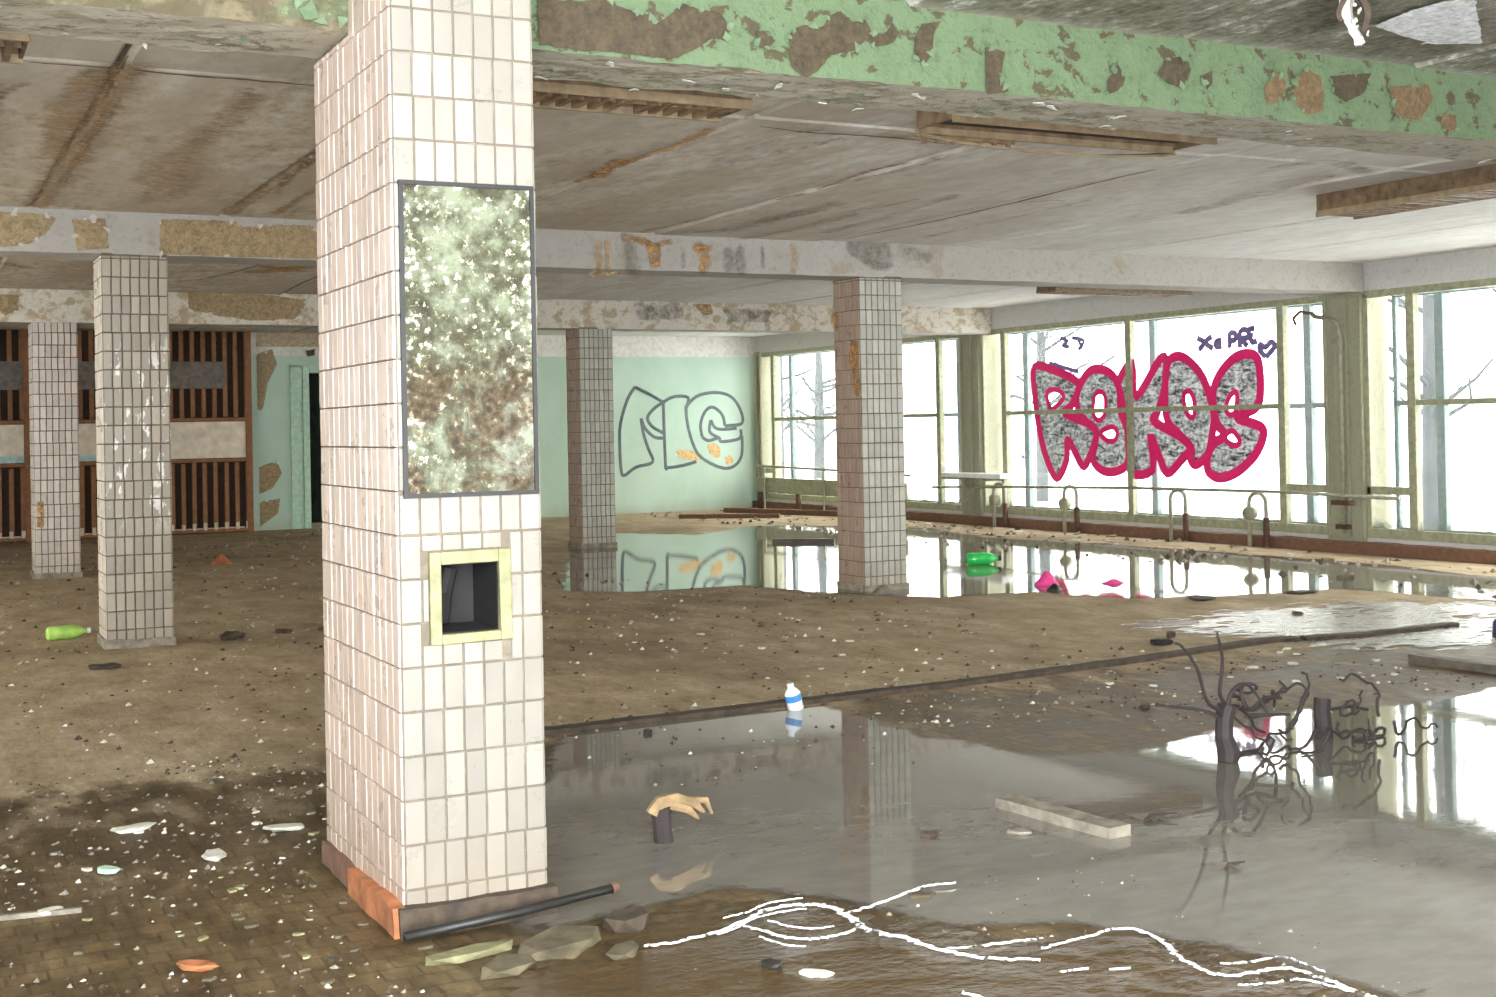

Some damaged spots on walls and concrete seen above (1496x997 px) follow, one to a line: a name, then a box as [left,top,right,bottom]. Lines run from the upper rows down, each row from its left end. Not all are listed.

damp [25,63,145,207]
damp [222,152,316,214]
peeling [0,208,110,251]
peeling [159,218,319,259]
peeling [0,294,21,315]
peeling [259,459,282,527]